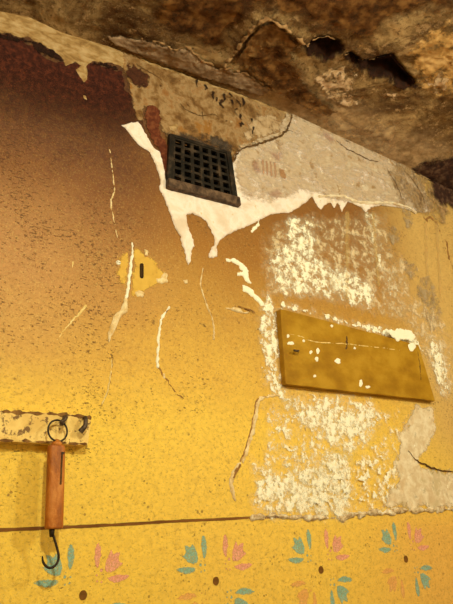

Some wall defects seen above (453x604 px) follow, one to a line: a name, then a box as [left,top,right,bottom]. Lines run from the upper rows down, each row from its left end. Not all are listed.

leakage [0,37,150,117]
flaking render [0,11,428,265]
mould [196,79,246,127]
crack [234,114,293,161]
leakage [236,113,453,228]
leakage [304,35,420,90]
crack [109,149,134,299]
peeling [226,258,264,314]
crack [156,306,184,399]
leakage [252,212,452,519]
flaking render [384,404,453,510]
crack [408,451,453,472]